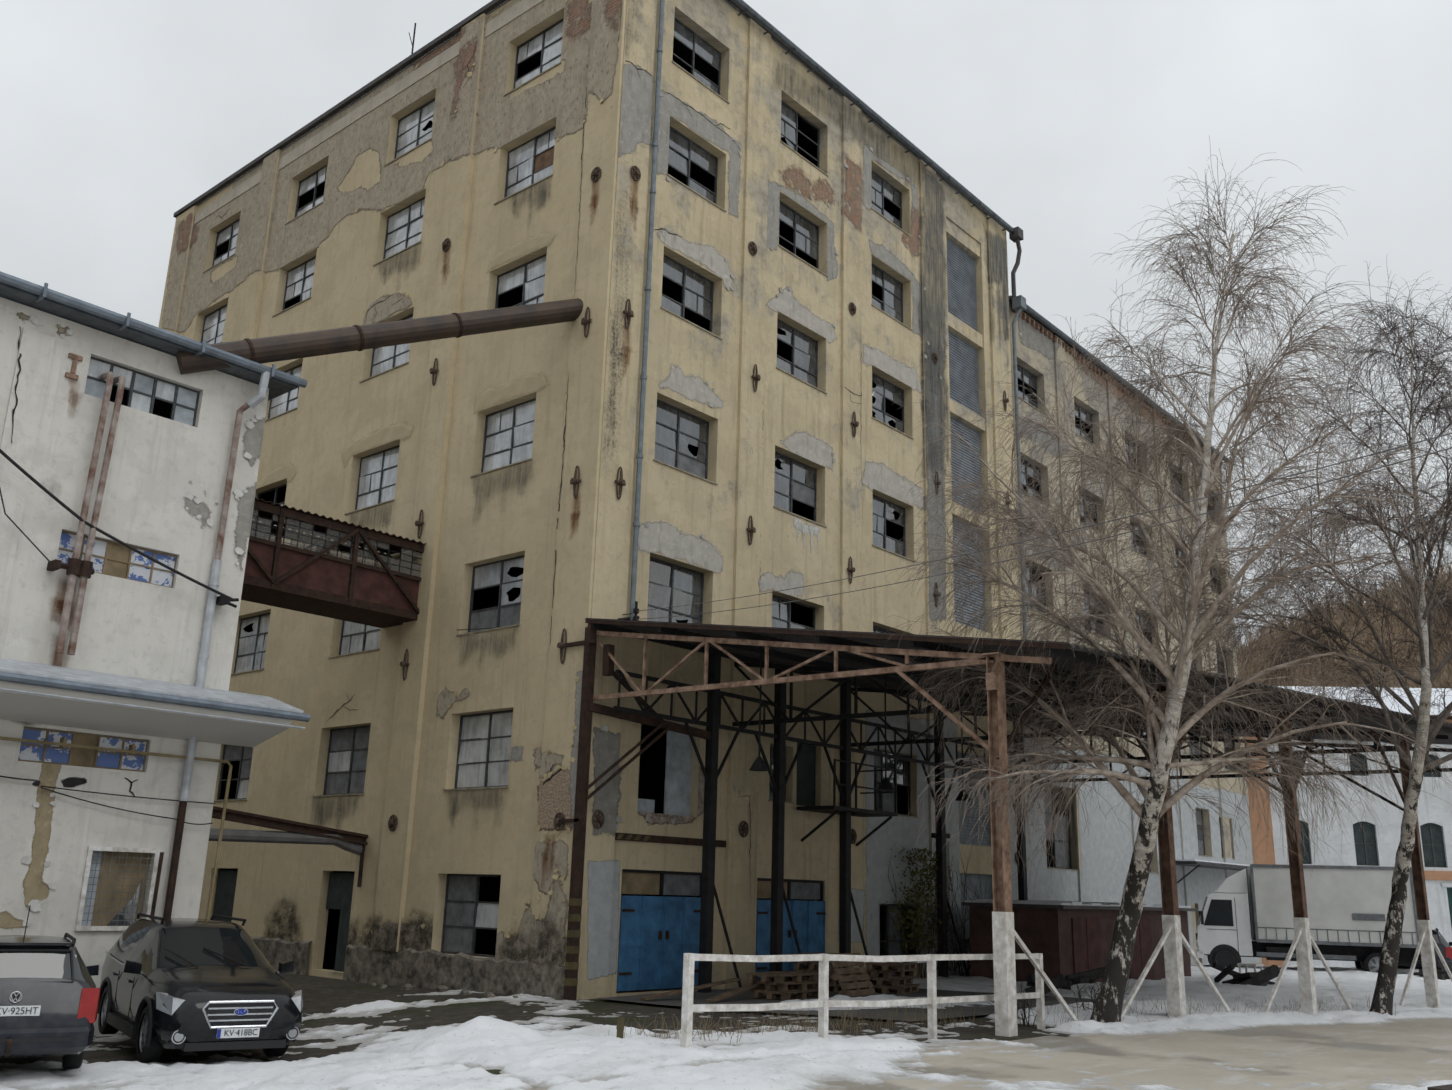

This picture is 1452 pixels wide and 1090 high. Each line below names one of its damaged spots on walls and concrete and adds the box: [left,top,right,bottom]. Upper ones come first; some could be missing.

flaking render [162,0,623,333]
flaking render [768,158,862,231]
crack [11,326,22,443]
flaking render [184,481,218,527]
flaking render [233,414,266,570]
flaking render [436,687,470,720]
flaking render [0,763,87,929]
flaking render [495,671,705,967]
water stain [347,916,433,952]
water stain [500,923,565,967]